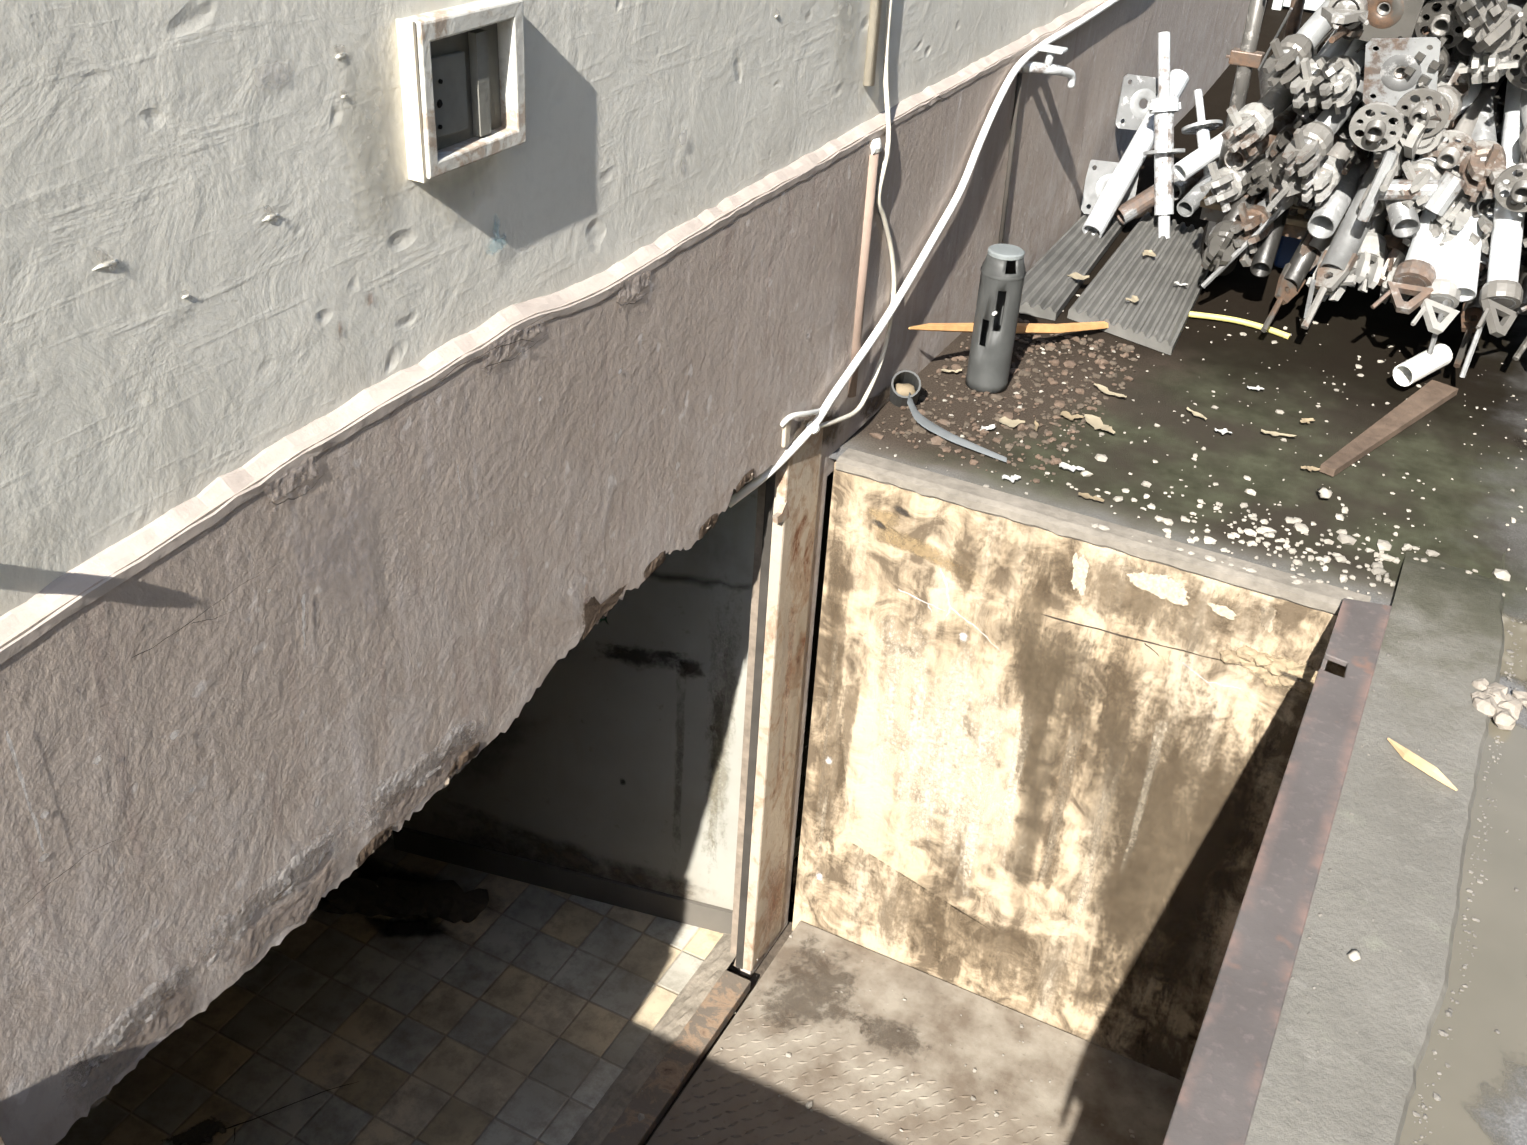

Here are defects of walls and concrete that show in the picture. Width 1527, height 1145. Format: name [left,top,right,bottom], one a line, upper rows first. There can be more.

damp [870,509,979,590]
damp [604,645,702,677]
damp [814,560,858,852]
flaking render [356,719,480,868]
damp [871,550,1275,1005]
flaking render [203,824,338,970]
damp [354,859,437,883]
damp [372,918,446,937]
flaking render [65,966,191,1103]